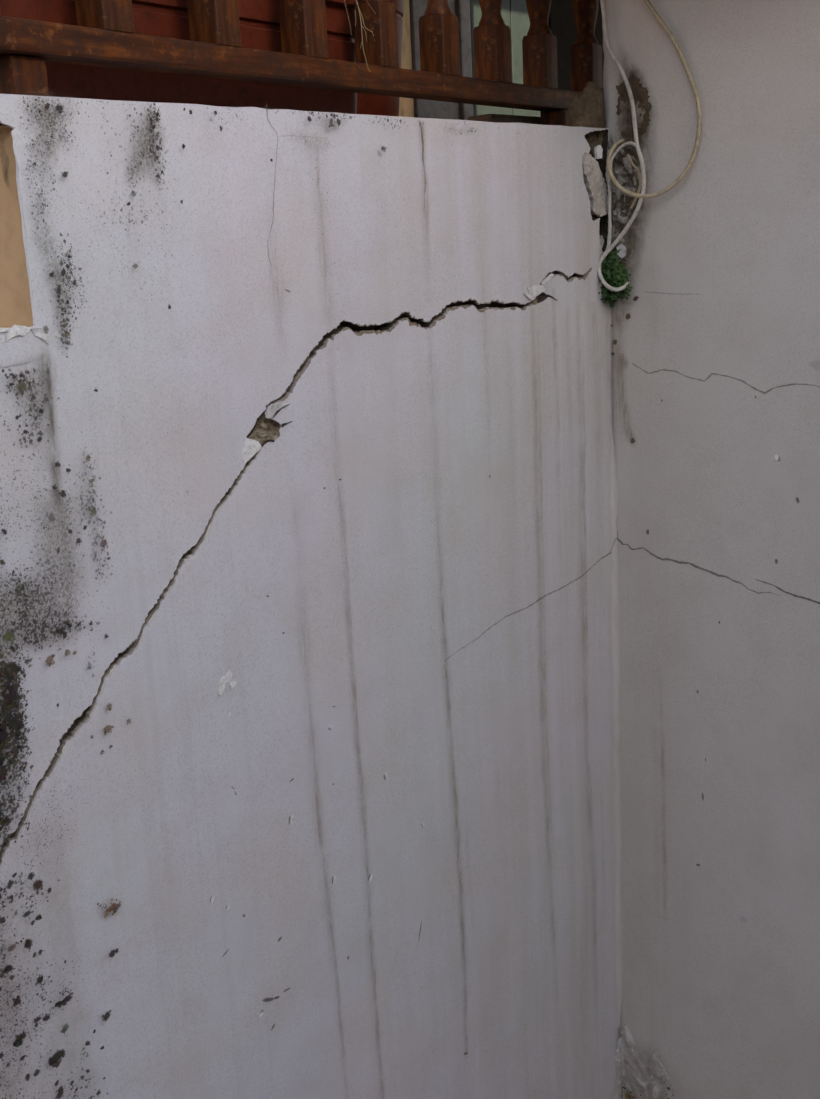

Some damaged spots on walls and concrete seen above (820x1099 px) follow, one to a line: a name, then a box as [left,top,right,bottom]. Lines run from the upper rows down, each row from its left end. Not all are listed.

mould [18,97,183,358]
spalling [582,72,644,287]
spalling [241,401,294,464]
crack [265,268,592,407]
crack [652,369,807,394]
water stain [0,363,109,1099]
crack [0,448,261,869]
crack [609,536,820,604]